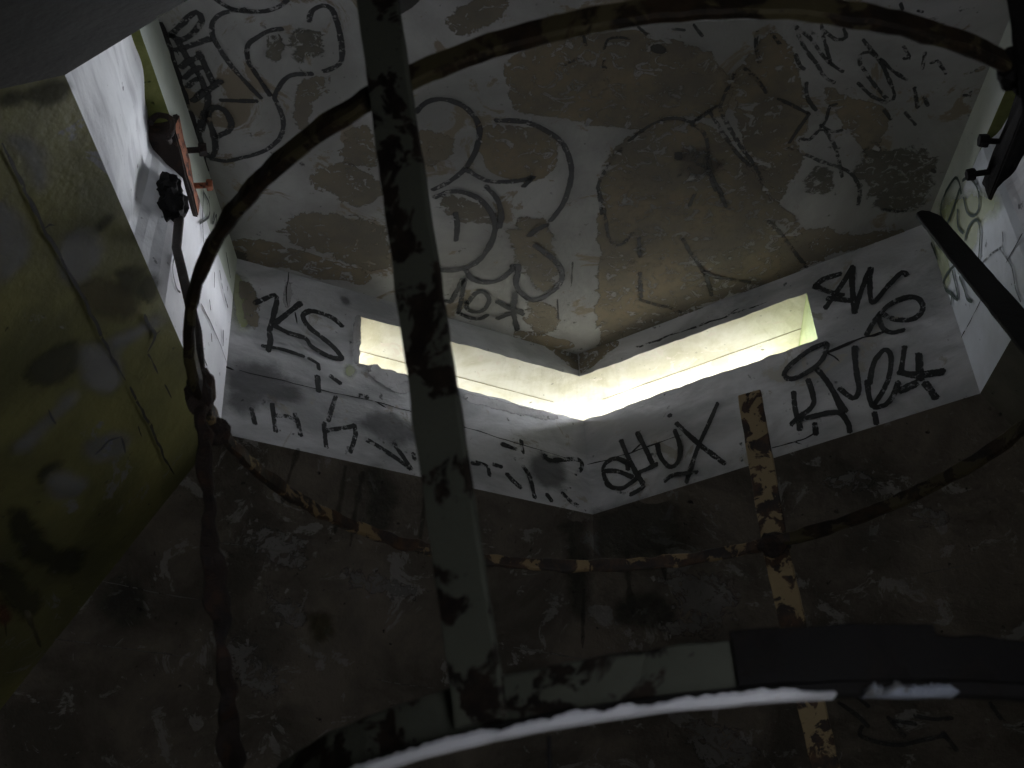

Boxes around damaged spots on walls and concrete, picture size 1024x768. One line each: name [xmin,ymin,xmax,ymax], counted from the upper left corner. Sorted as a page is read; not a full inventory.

peeling [232,125,392,308]
peeling [506,217,703,373]
peeling [775,226,905,279]